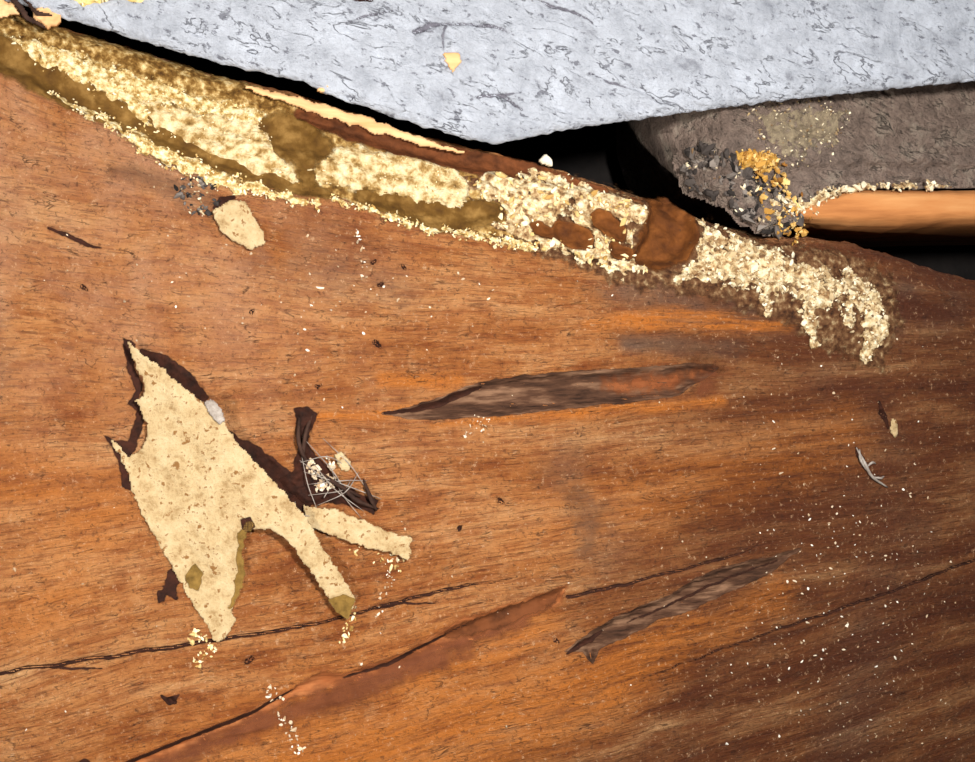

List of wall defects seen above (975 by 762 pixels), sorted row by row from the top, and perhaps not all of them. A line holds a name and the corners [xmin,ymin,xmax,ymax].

crack [0,578,509,678]
peeling [104,338,412,642]